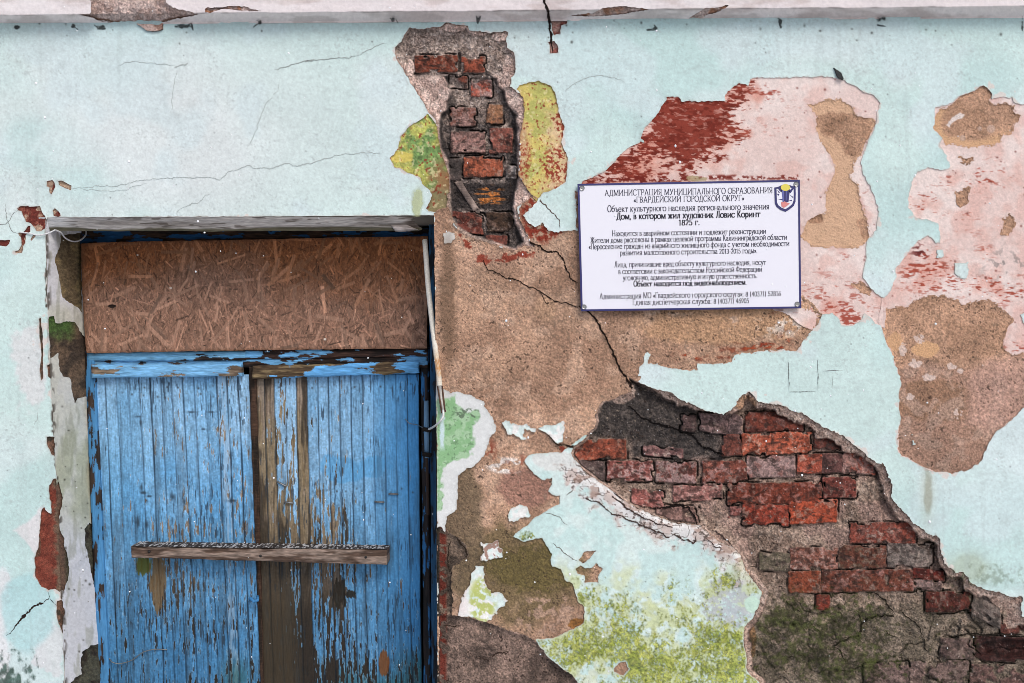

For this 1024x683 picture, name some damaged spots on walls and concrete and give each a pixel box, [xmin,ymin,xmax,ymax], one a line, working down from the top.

flaking render [83,0,258,32]
crack [543,0,553,51]
peeling [47,180,71,194]
peeling [0,206,61,253]
peeling [39,233,86,403]
crack [483,241,724,456]
peeling [390,23,1024,683]
peeling [47,436,55,456]
peeling [35,479,69,633]
peeling [85,523,94,584]
crack [6,596,56,636]
peeling [71,644,100,683]